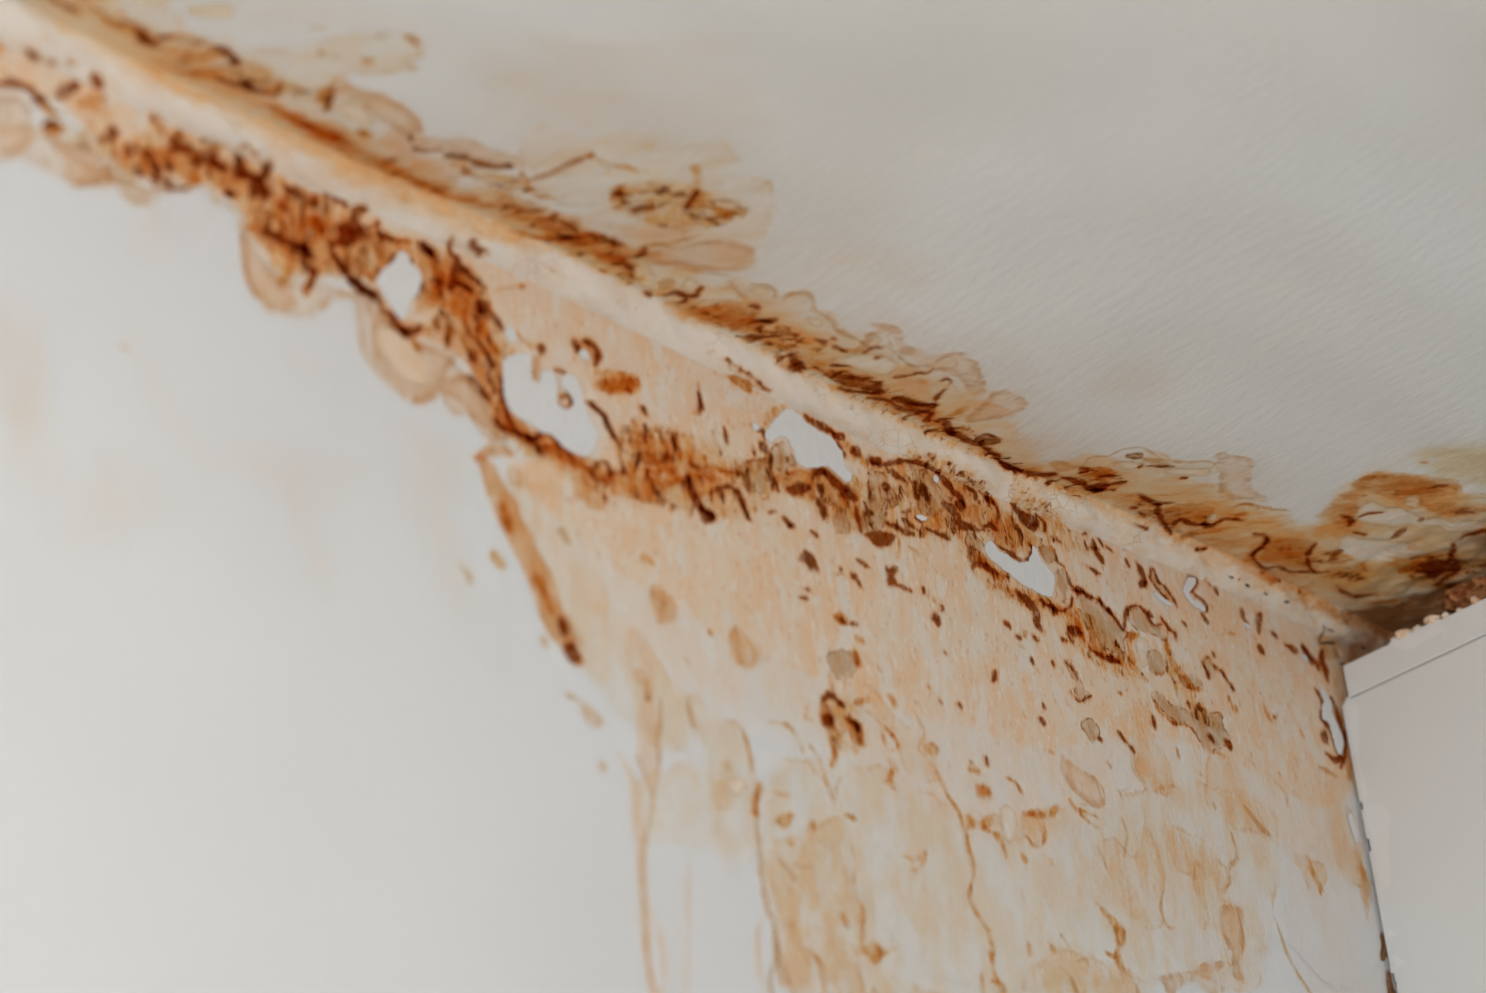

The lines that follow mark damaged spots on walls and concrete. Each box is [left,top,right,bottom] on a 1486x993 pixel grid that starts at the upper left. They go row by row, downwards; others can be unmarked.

peeling [377,250,422,319]
peeling [502,326,599,458]
peeling [752,408,852,482]
peeling [985,541,1055,597]
peeling [1154,575,1206,612]
water stain [559,617,568,637]
water stain [563,641,581,664]
water stain [822,691,845,708]
peeling [1319,688,1344,754]
water stain [1320,708,1347,768]
water stain [1000,804,1018,842]
water stain [1380,932,1388,961]